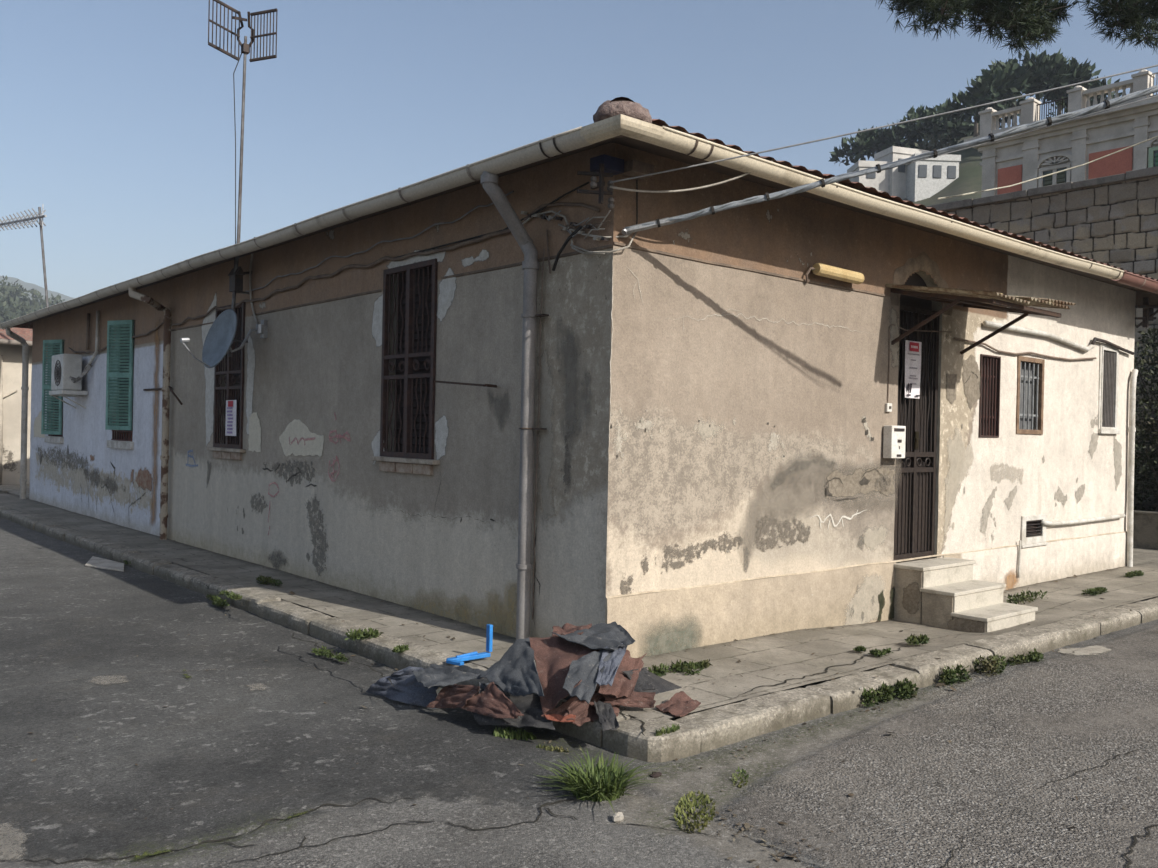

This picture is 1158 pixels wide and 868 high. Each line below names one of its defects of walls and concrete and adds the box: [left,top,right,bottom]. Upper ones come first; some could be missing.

peeling [263,460,328,575]
water stain [563,330,590,491]
flaking render [620,515,811,595]
peeling [944,424,974,538]
peeling [981,463,1023,549]
peeling [1054,478,1085,507]
peeling [1088,415,1103,457]
peeling [1113,437,1122,490]